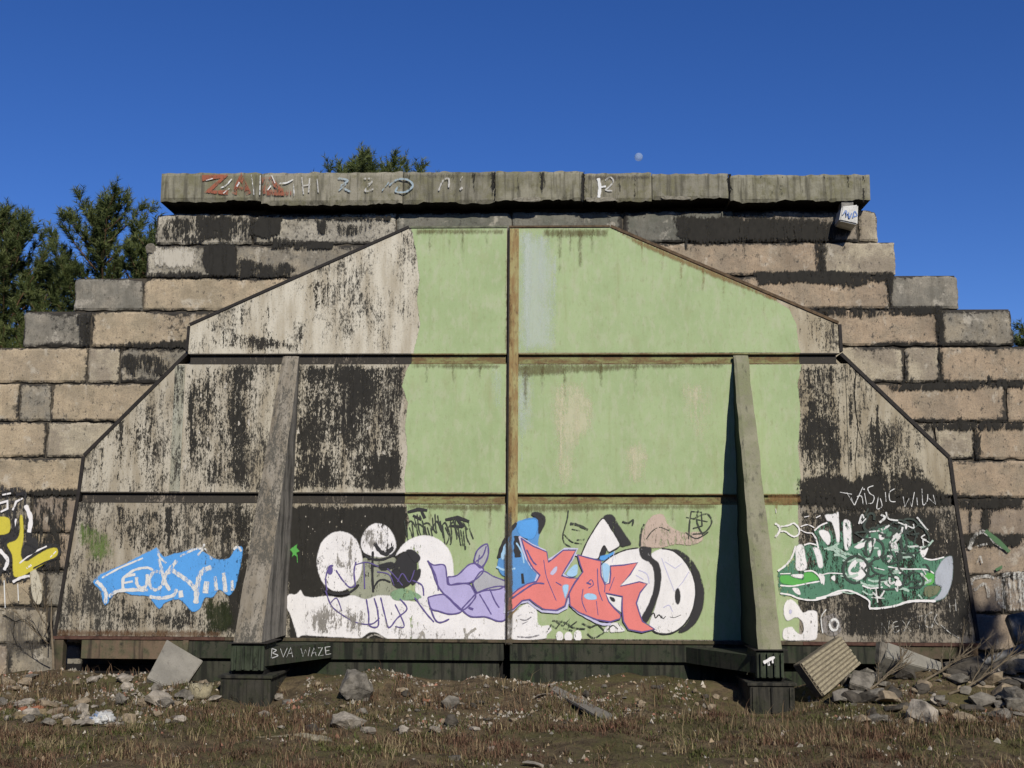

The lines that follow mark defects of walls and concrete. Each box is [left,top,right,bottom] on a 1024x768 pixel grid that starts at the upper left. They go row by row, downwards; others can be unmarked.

leakage [673,213,1024,392]
leakage [100,396,169,487]
leakage [82,504,254,633]